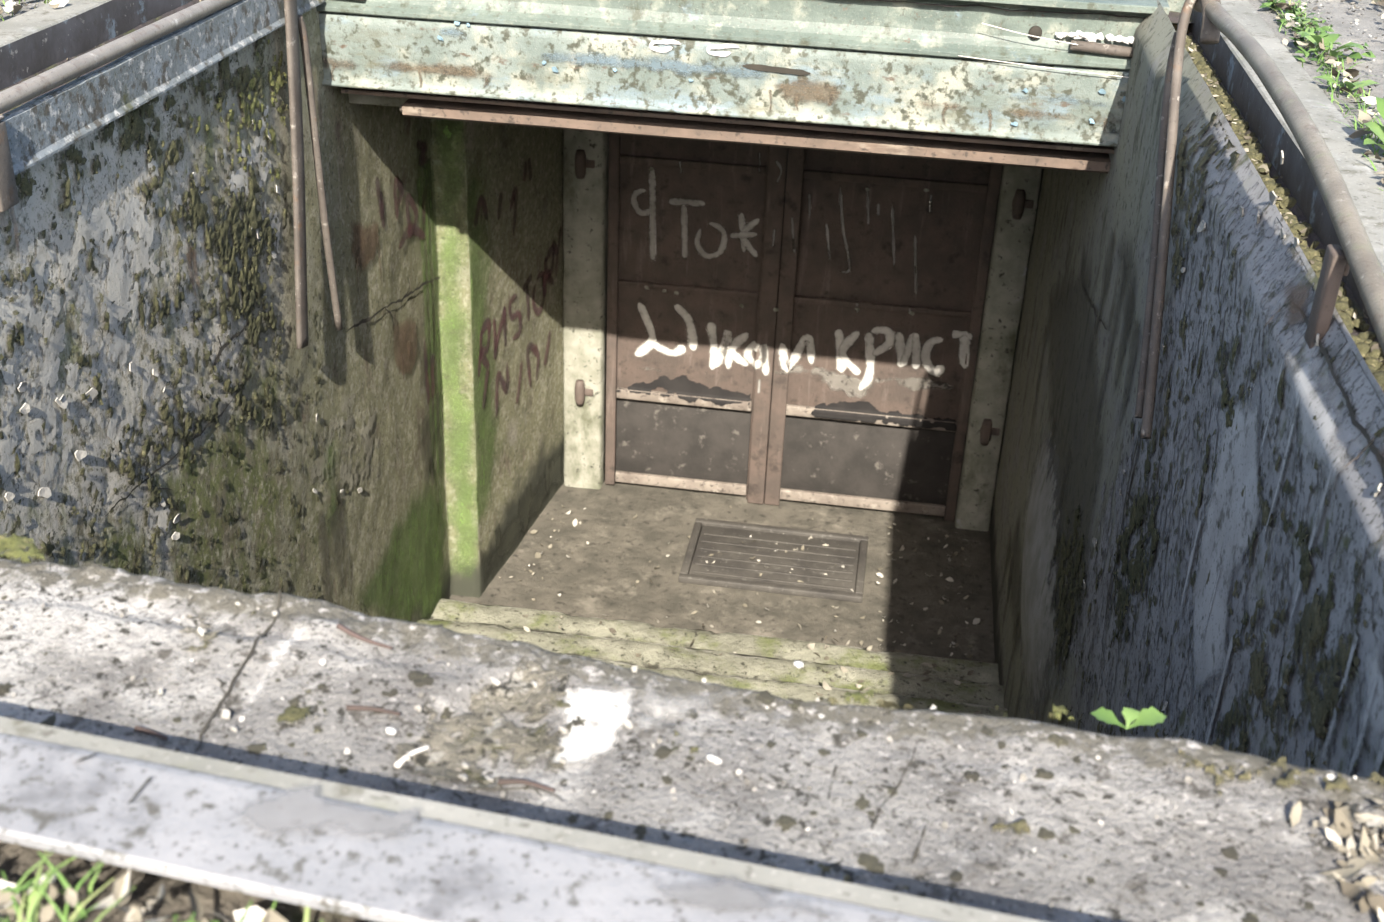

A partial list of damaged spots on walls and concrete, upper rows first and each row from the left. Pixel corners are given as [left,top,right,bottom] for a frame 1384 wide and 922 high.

rust [769,77,839,110]
crack [347,277,440,332]
water stain [1179,357,1344,745]
water stain [1320,632,1384,778]